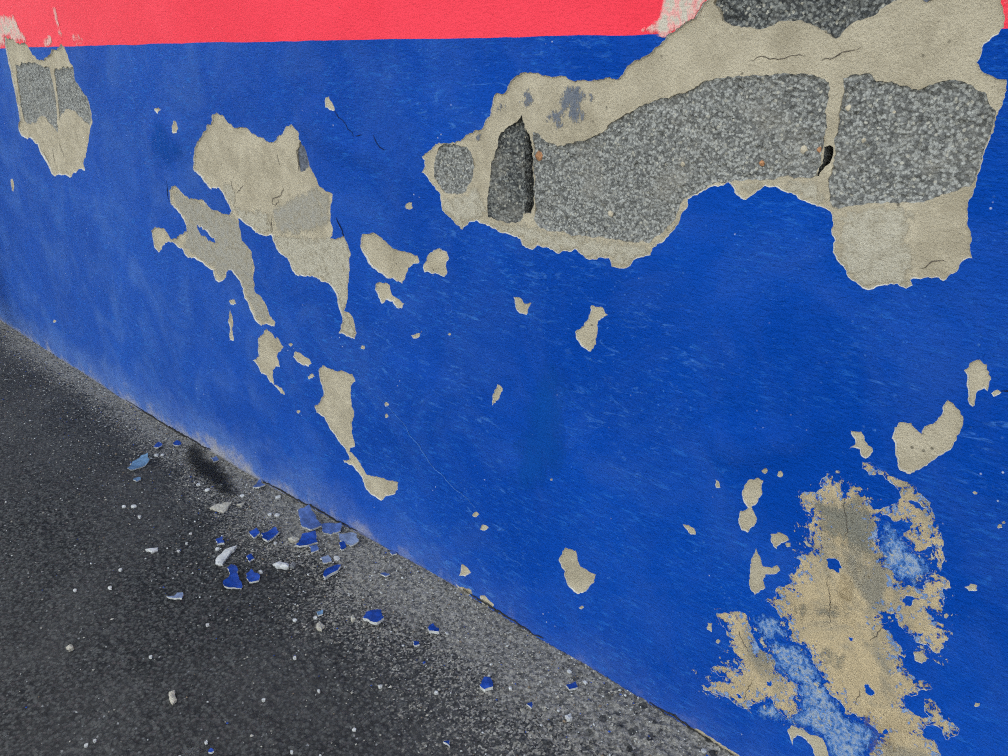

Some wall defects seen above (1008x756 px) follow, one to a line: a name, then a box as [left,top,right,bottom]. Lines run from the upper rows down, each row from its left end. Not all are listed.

flaking render [0,15,92,177]
flaking render [422,0,1007,290]
flaking render [151,112,449,500]
flaking render [514,297,531,315]
flaking render [575,305,607,351]
flaking render [559,548,595,594]
flaking render [691,360,1001,756]